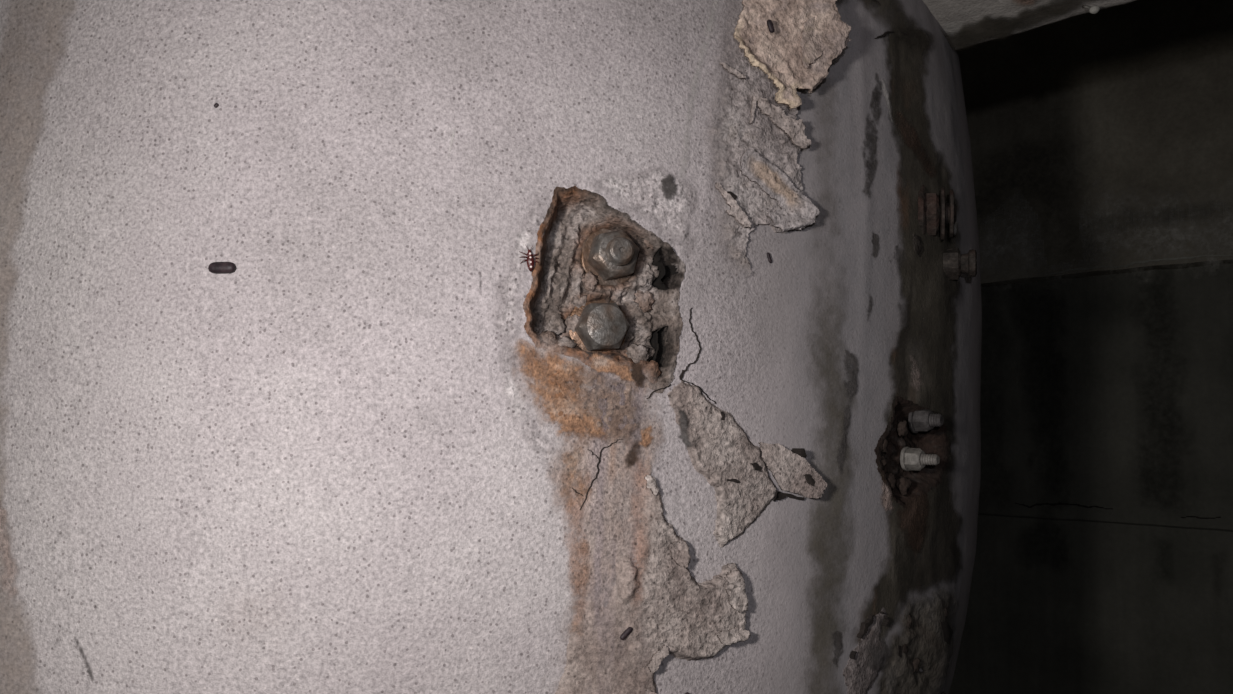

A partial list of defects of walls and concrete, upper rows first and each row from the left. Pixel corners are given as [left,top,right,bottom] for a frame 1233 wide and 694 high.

damp [0,0,70,365]
corrosion [519,343,661,657]
peeling [555,462,751,694]
spalling [497,169,827,547]
crack [646,308,716,404]
peeling [714,0,851,271]
damp [811,322,858,694]
spalling [843,590,958,694]
damp [862,0,1091,639]